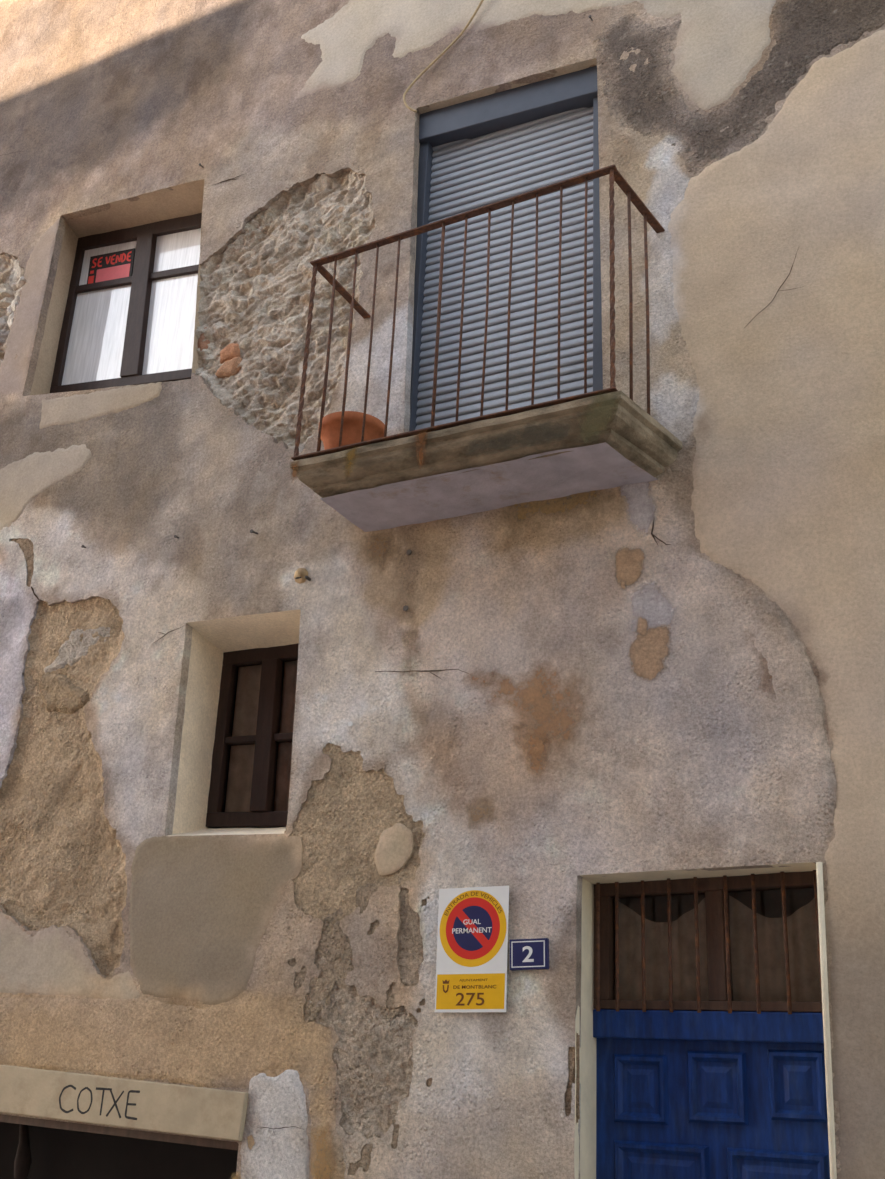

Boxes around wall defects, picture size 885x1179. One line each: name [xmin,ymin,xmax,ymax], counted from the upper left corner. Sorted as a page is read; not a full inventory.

spalling [591,0,885,173]
spalling [615,548,644,589]
spalling [630,617,669,680]
spalling [0,597,127,978]
spalling [284,743,430,1175]